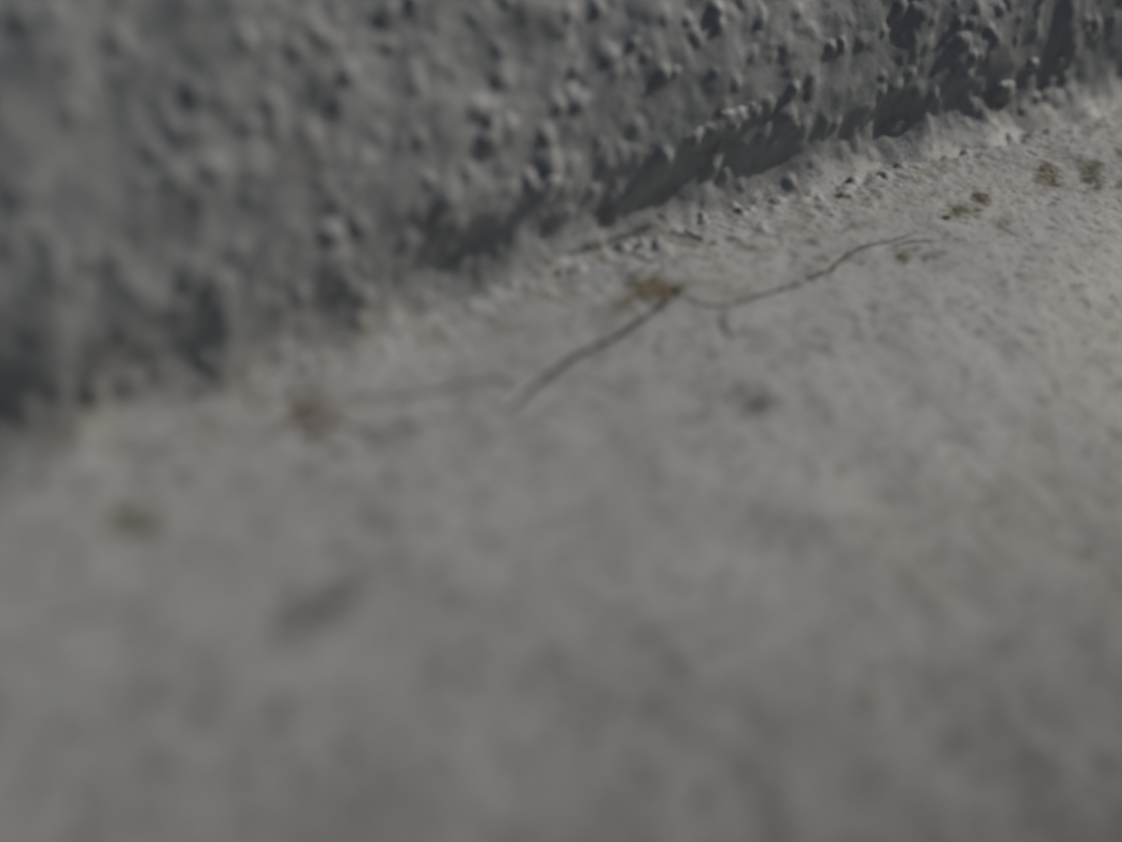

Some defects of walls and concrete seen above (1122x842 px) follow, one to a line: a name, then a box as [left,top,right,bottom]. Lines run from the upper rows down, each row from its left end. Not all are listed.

crack [328,235,935,434]